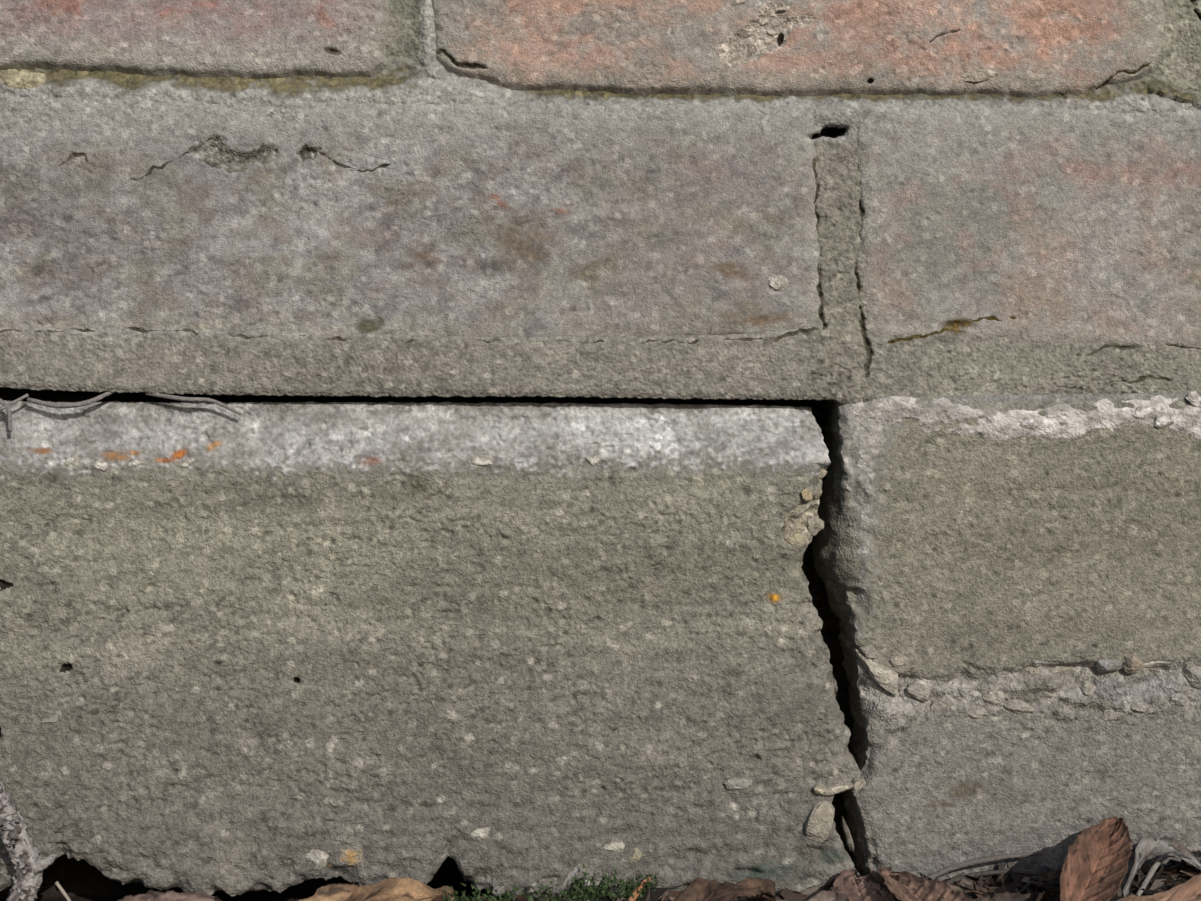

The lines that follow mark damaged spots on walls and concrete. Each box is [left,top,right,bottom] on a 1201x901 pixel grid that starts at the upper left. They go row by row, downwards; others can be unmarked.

crack [1190,0,1201,21]
crack [59,153,95,174]
crack [641,158,827,344]
crack [854,164,1023,378]
crack [0,327,199,336]
crack [228,332,267,340]
crack [299,334,360,342]
crack [0,387,829,449]
crack [801,535,866,860]
spalling [855,645,1201,733]
flaking render [306,849,363,870]